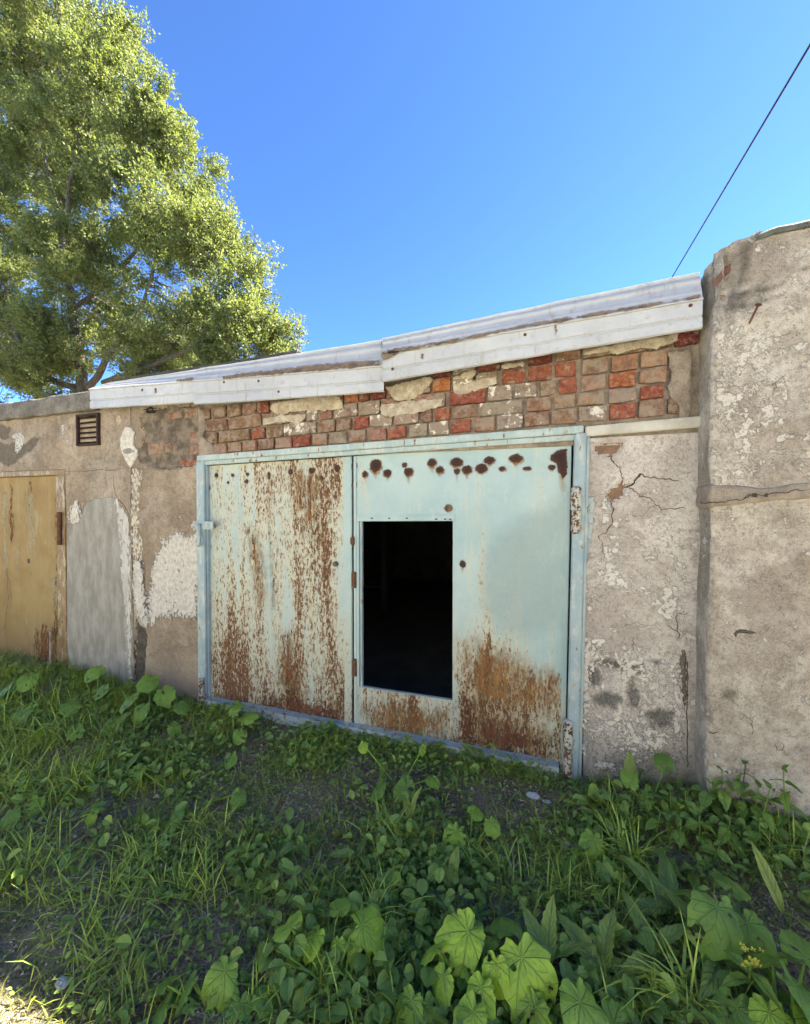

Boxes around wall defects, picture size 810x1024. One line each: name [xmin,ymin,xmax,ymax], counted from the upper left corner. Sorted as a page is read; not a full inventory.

flaking render [582,333,679,355]
flaking render [263,396,344,426]
flaking render [380,361,525,418]
rust [427,454,531,475]
rust [548,449,568,478]
flaking render [595,443,623,457]
peeling [123,406,199,681]
rust [288,468,324,590]
crack [591,458,810,561]
rust [262,630,344,719]
rust [365,640,561,761]
damp [588,660,671,727]